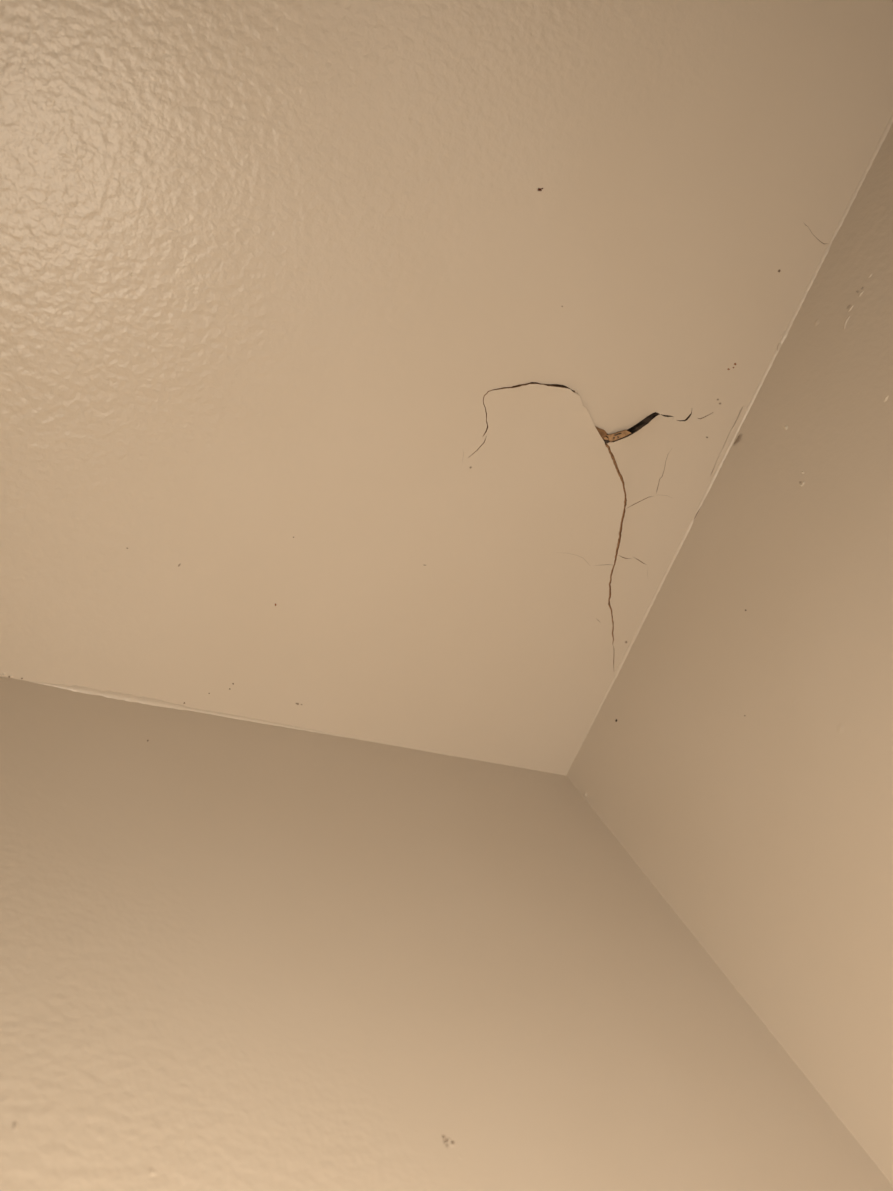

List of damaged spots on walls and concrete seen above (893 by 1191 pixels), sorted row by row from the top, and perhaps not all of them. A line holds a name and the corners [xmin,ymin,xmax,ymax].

crack [468,382,712,664]